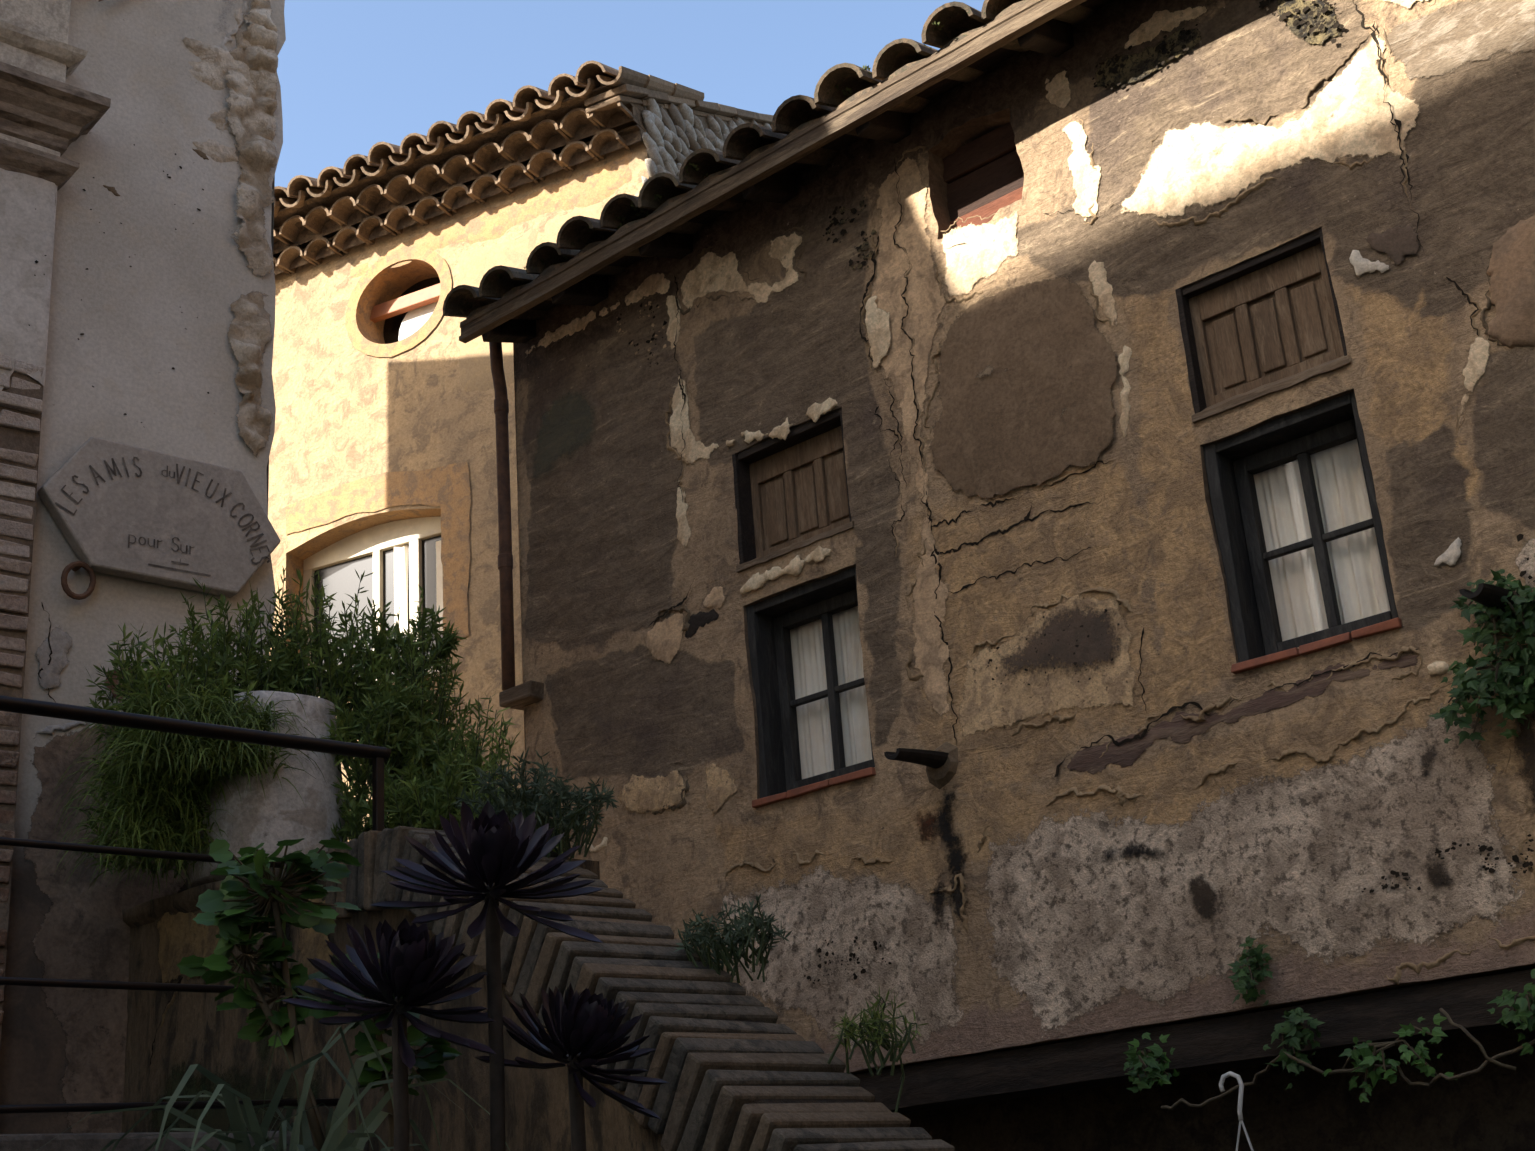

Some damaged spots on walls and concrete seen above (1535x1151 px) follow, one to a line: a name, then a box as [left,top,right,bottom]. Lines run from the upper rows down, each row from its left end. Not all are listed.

flaking render [1124,6,1207,49]
crack [1352,0,1375,35]
flaking render [1045,21,1419,228]
flaking render [1349,250,1389,276]
flaking render [525,146,1137,738]
crack [926,459,1112,744]
leakage [1421,734,1436,777]
leakage [930,789,968,926]
leakage [1092,844,1159,863]
flaking render [717,661,1535,1053]
leakage [1426,845,1453,888]
leakage [1189,874,1216,918]